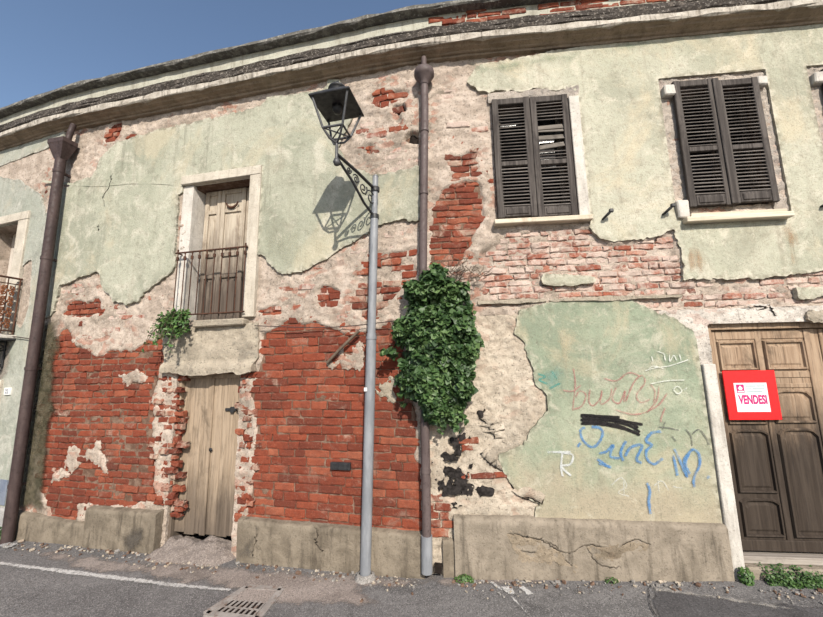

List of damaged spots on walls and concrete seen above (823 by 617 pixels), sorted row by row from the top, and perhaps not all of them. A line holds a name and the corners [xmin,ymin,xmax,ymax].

spalling [63,81,327,189]
spalling [0,148,55,213]
crack [42,173,182,233]
spalling [16,261,32,328]
flaking render [231,53,823,575]
flaking render [19,268,191,547]
crack [313,525,324,552]
crack [506,531,651,569]